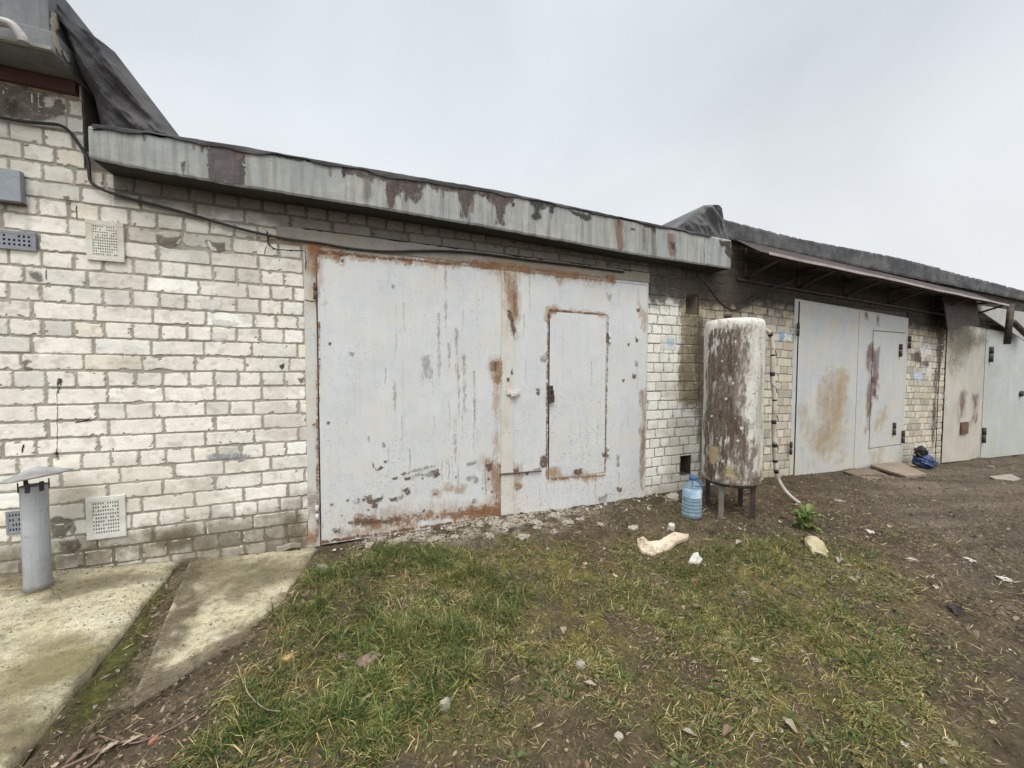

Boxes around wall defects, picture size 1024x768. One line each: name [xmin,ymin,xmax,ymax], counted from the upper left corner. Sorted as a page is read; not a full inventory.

rust [507,294,518,339]
rust [490,360,513,382]
rust [546,308,609,480]
rust [867,344,879,417]
rust [307,322,501,544]
spalling [346,469,440,518]